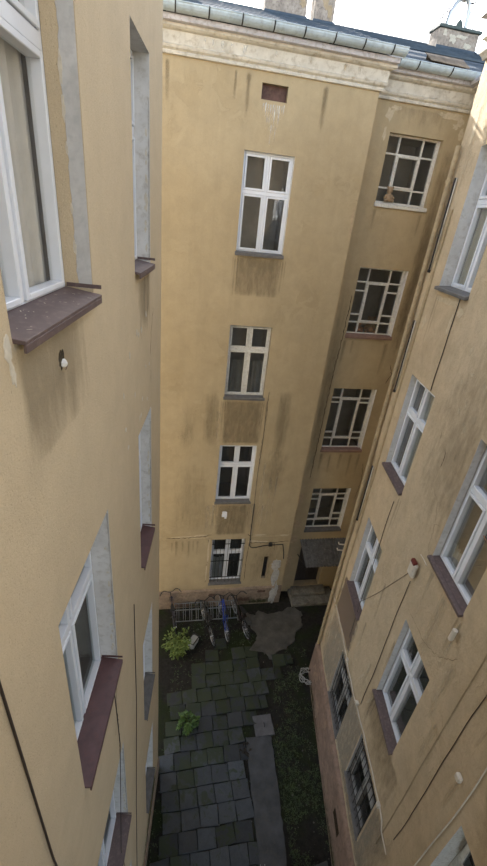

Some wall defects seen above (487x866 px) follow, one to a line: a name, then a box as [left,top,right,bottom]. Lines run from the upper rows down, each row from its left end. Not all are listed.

peeling [54,0,92,289]
spalling [443,28,471,50]